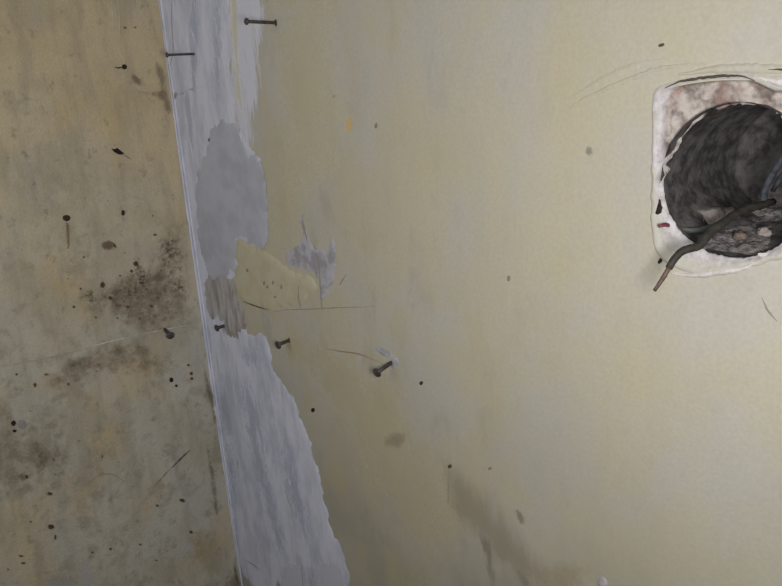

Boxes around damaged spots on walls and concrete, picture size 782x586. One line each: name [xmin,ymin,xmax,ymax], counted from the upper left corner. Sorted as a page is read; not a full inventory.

spalling [568,58,782,278]
leakage [80,240,184,327]
peeling [158,0,350,586]